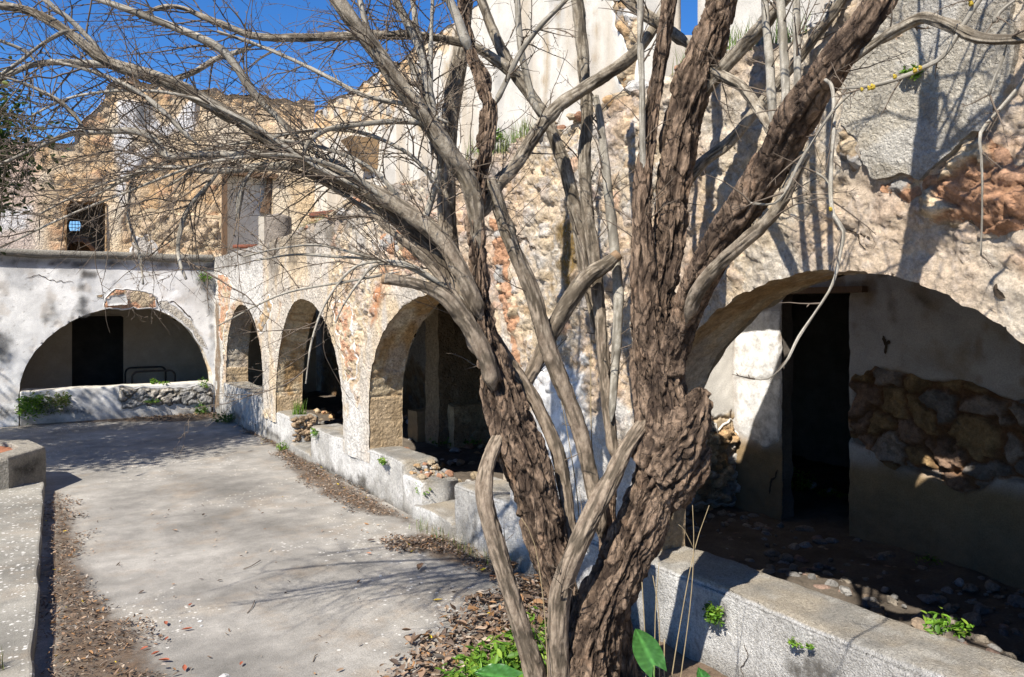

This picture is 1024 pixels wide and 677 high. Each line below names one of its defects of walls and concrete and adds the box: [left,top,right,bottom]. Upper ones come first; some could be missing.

flaking render [880,133,1024,237]
flaking render [96,288,207,349]